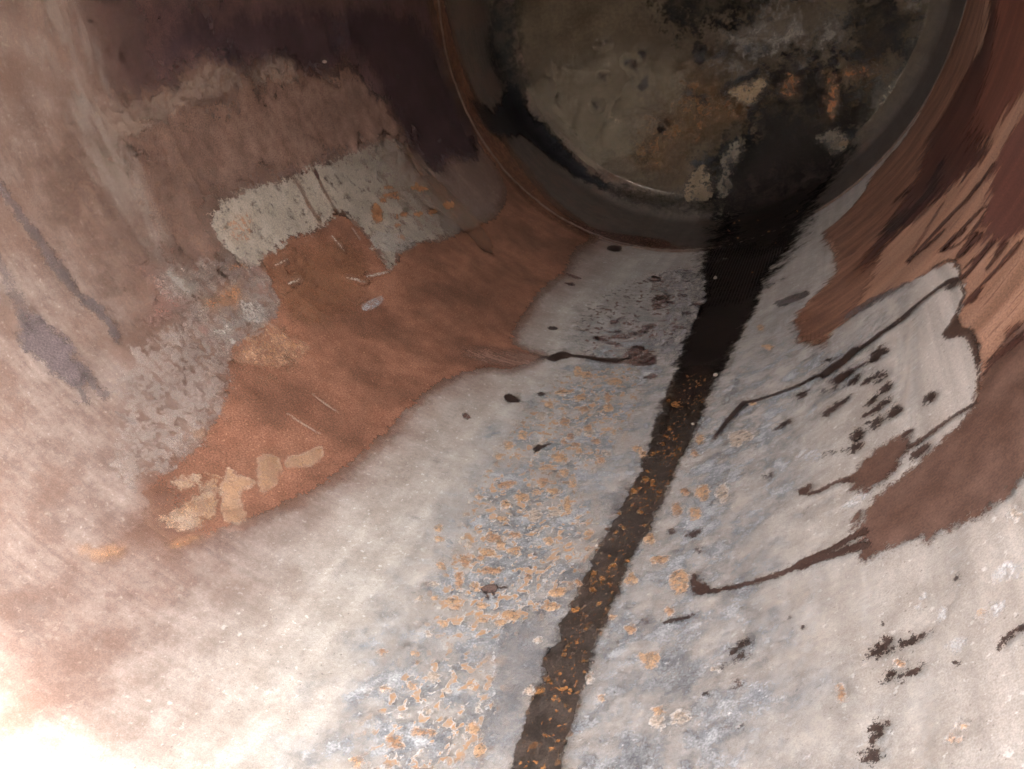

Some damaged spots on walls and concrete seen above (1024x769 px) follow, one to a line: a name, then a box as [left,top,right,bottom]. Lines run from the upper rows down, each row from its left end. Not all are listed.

peeling [113,141,476,492]
corrosion [141,0,697,543]
corrosion [348,270,702,769]
corrosion [536,52,747,169]
water stain [343,0,1024,769]
corrosion [671,482,729,521]